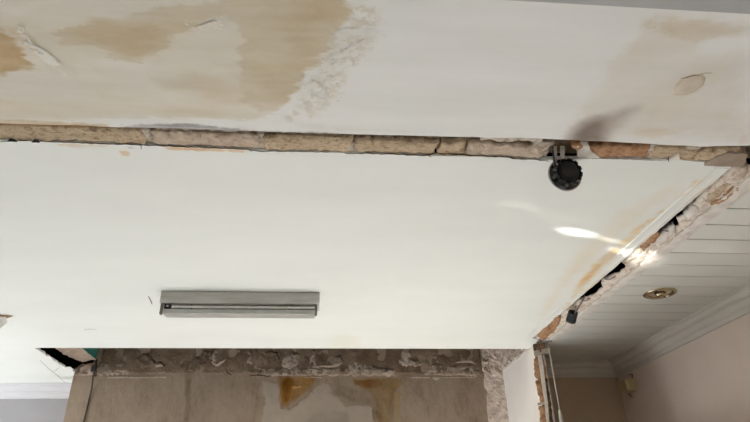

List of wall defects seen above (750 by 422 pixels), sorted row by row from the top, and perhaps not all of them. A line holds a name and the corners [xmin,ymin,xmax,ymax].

flaking render [0,123,750,422]